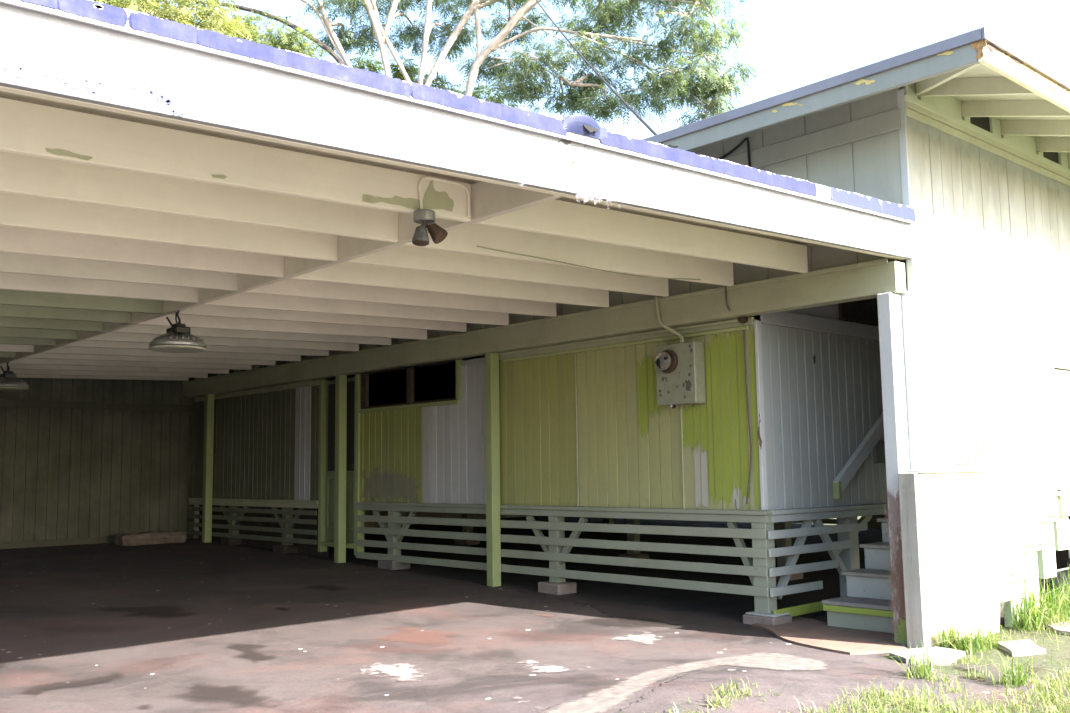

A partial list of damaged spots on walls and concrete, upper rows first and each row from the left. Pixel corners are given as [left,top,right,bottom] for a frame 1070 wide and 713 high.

peeling [971,40,987,59]
peeling [21,0,593,171]
peeling [363,180,454,211]